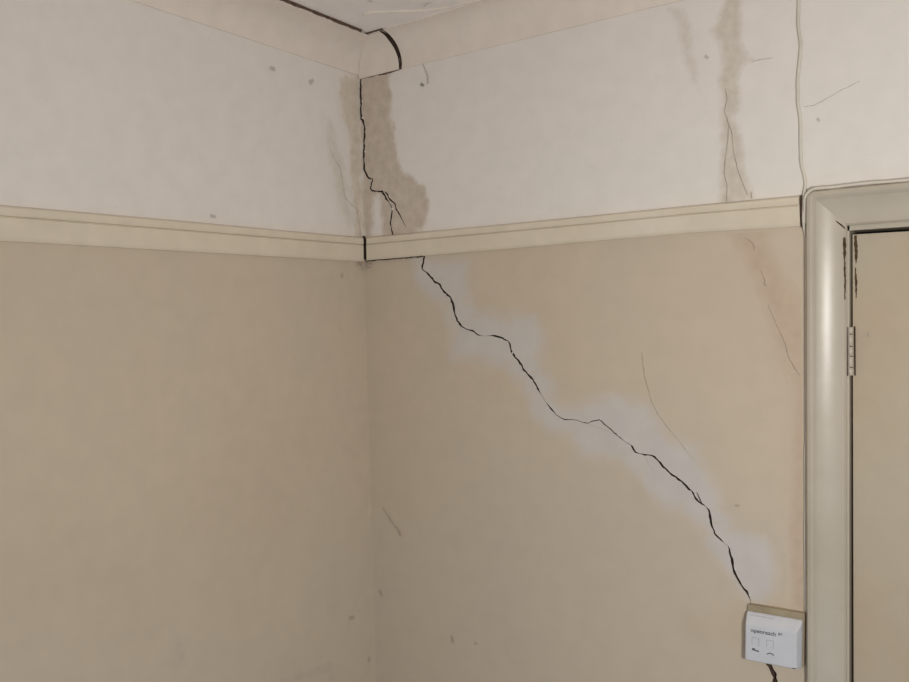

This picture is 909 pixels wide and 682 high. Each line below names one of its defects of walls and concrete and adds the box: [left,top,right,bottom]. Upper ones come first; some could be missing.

crack [281,0,406,235]
damp [322,71,433,237]
damp [664,0,759,204]
crack [724,88,752,202]
crack [329,147,751,602]
damp [721,231,803,611]
crack [744,237,800,375]
crack [766,664,778,682]